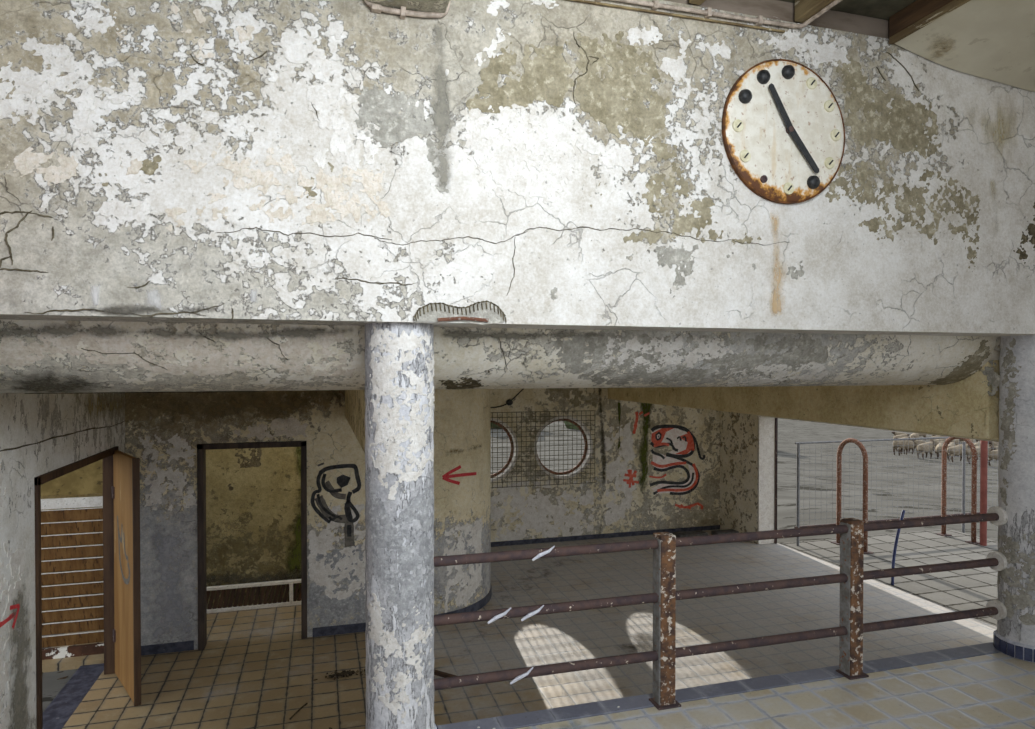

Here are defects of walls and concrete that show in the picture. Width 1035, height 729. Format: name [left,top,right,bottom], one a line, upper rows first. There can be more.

peeling [0,0,142,145]
spalling [92,21,449,231]
damp [432,65,451,185]
peeling [464,0,761,298]
spalling [752,28,980,272]
crack [0,211,54,273]
crack [27,303,234,342]
crack [216,226,785,294]
corrosion [773,268,781,313]
damp [14,374,94,393]
crack [0,421,124,452]
peeling [0,300,637,729]